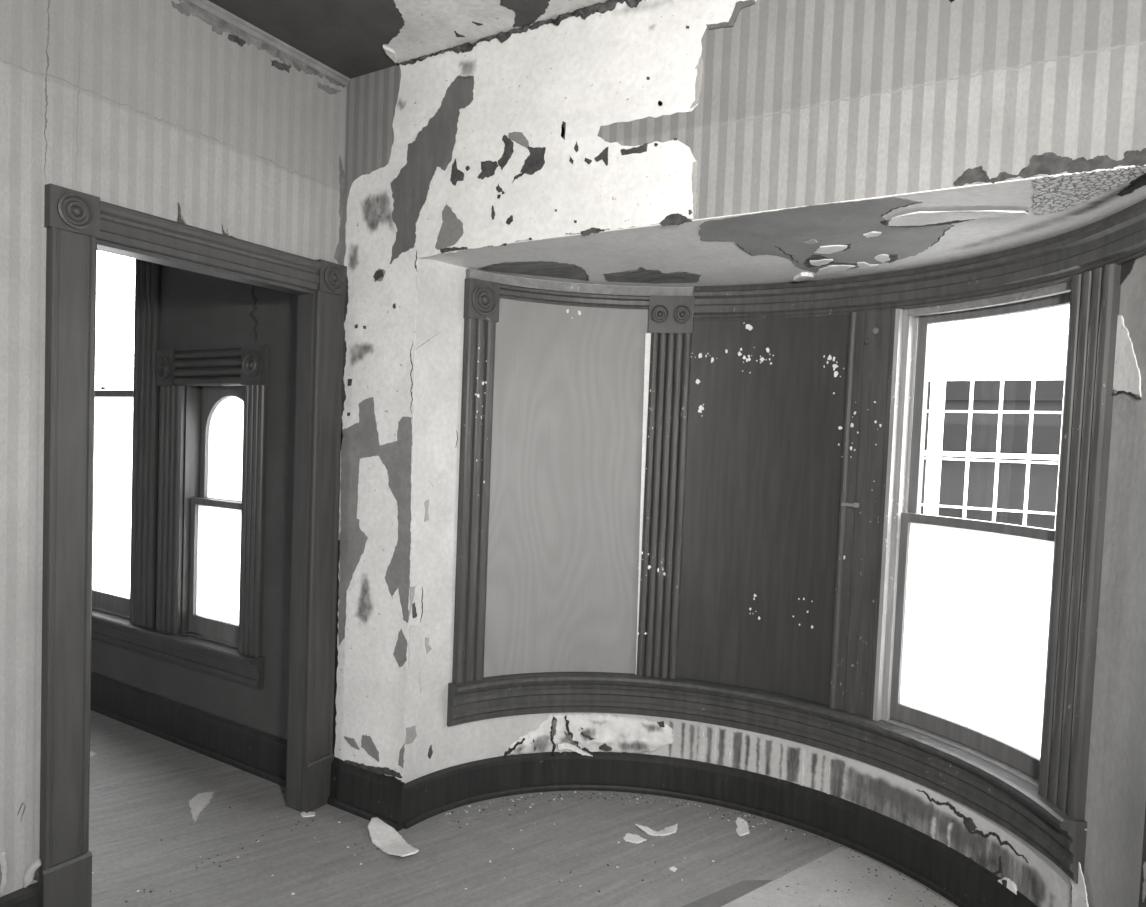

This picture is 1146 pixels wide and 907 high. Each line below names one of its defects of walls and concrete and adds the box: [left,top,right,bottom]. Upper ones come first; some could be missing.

crack [1031,165,1146,215]
flaking render [334,0,1029,780]
peeling [1112,315,1142,400]
damp [670,724,770,775]
damp [788,748,816,786]
damp [828,760,1044,906]